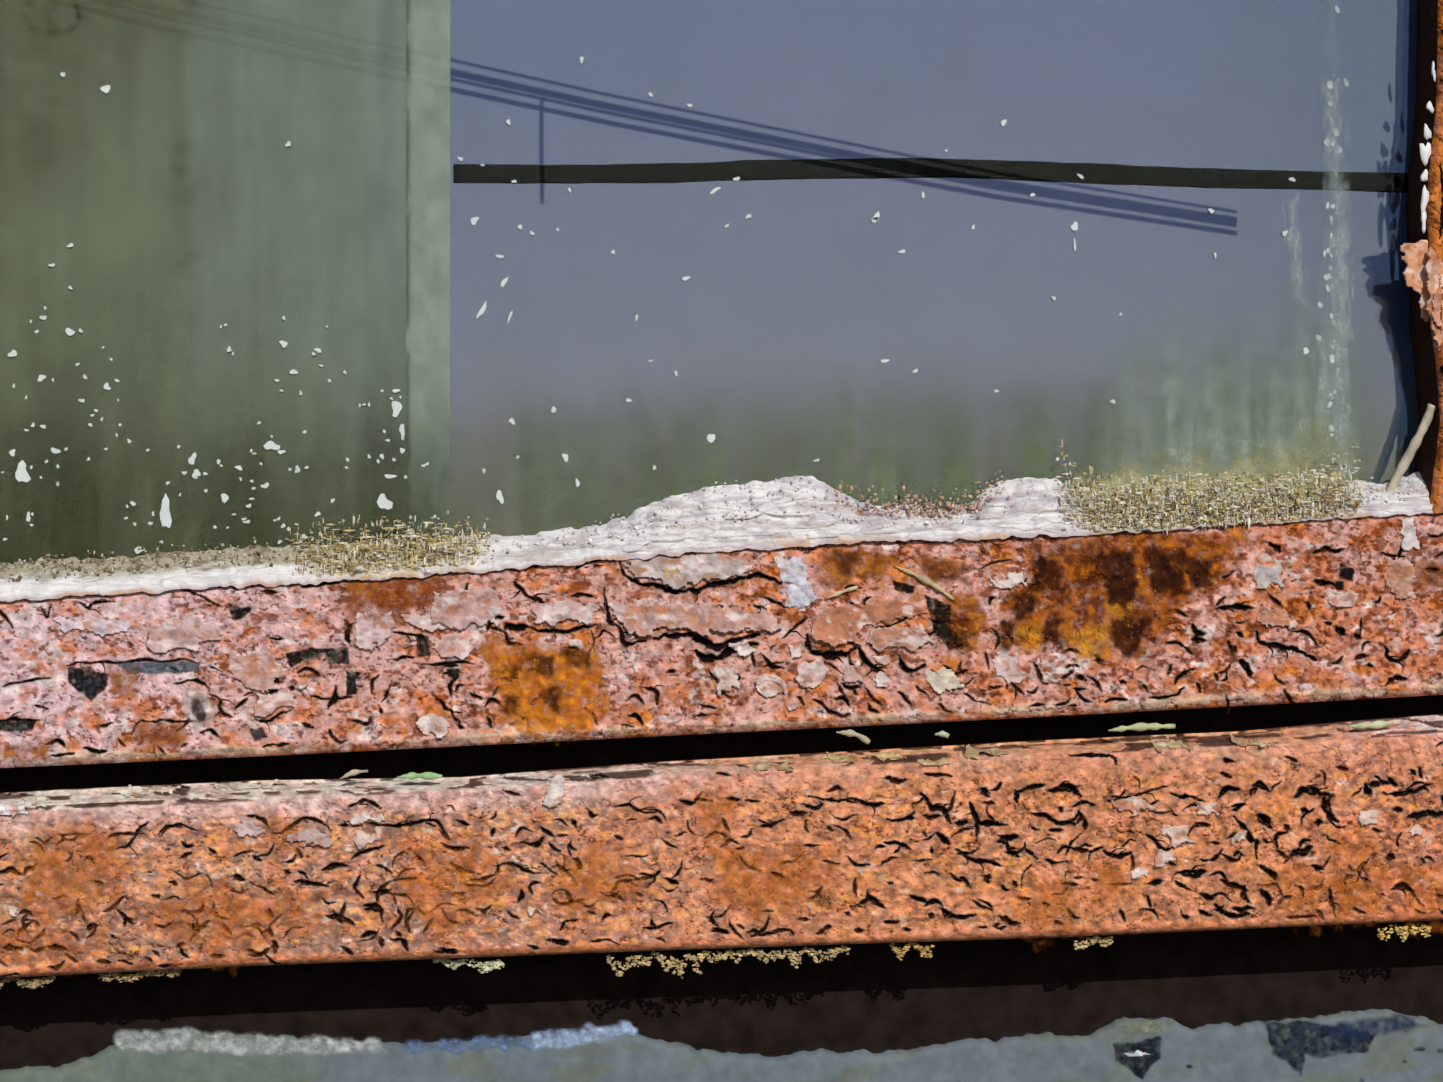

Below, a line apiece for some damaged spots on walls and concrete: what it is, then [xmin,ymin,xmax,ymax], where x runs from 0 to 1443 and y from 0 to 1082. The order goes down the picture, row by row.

peeling [1400,240,1443,350]
damp [521,450,695,533]
damp [794,452,823,482]
damp [872,447,970,509]
damp [1067,391,1351,517]
corrosion [347,572,451,624]
corrosion [819,549,891,588]
corrosion [923,519,1247,659]
crack [1380,533,1443,573]
corrosion [482,638,609,737]
crack [0,542,1443,757]
crack [0,741,1443,977]